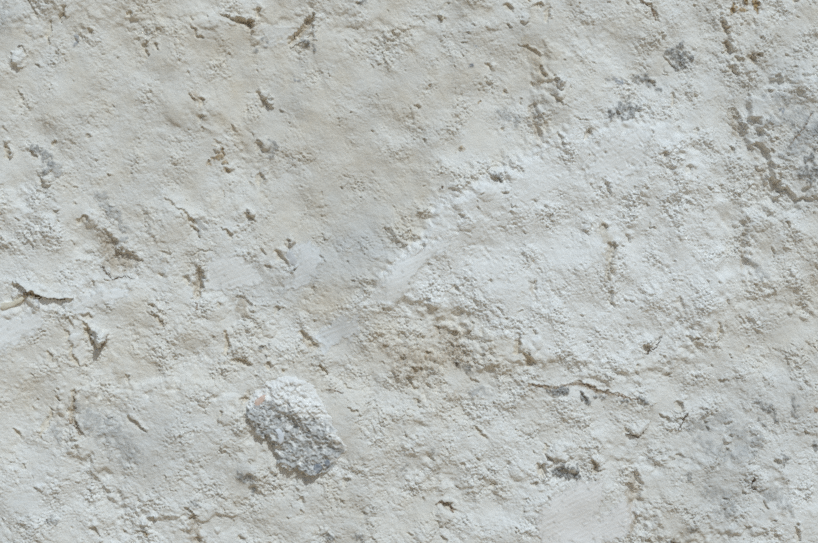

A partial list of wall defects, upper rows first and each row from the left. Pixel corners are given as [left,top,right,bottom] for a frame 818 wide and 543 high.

crack [528,382,639,400]